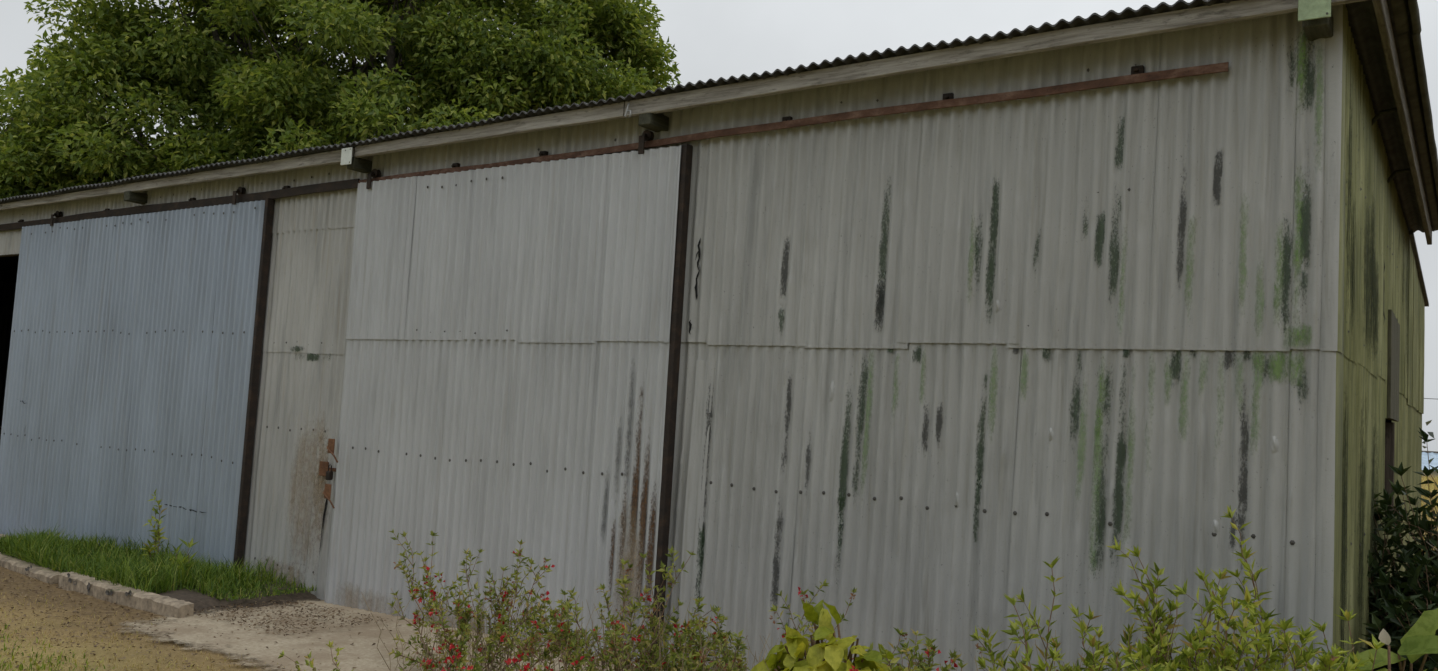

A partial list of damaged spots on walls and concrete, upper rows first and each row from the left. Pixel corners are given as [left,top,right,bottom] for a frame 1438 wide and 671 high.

leakage [1290,33,1323,143]
leakage [1239,179,1311,332]
leakage [1347,211,1378,330]
rust [609,392,656,611]
leakage [973,367,997,542]
leakage [1070,354,1134,568]
leakage [1229,358,1263,548]
leakage [1341,436,1377,650]